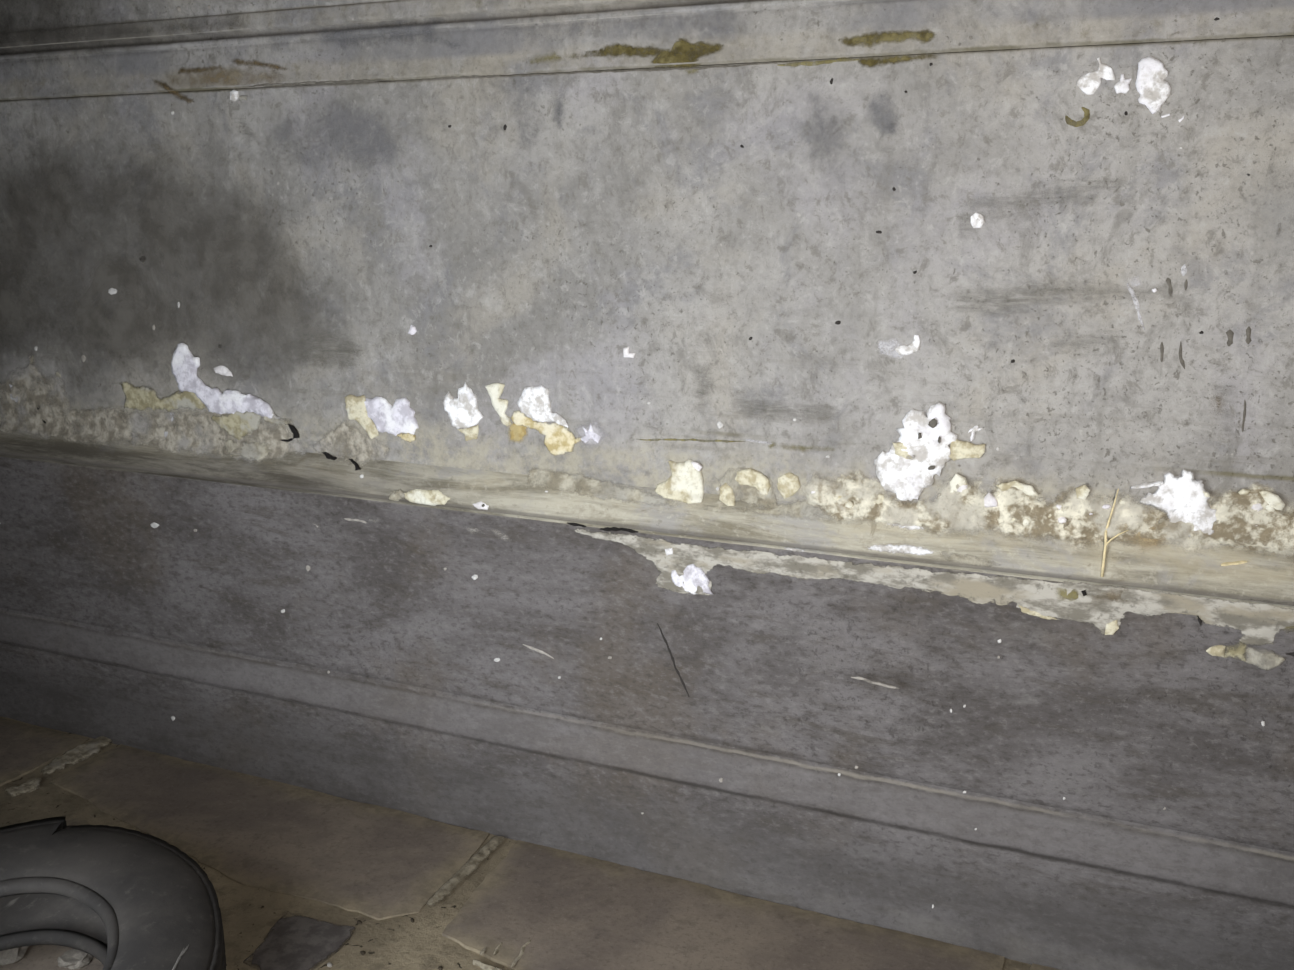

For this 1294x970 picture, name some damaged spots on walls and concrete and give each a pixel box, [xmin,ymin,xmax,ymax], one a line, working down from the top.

leakage [0,0,149,53]
peeling [1077,56,1184,122]
leakage [0,165,310,367]
peeling [0,343,419,465]
peeling [443,382,581,456]
peeling [655,460,800,509]
peeling [575,528,1294,670]